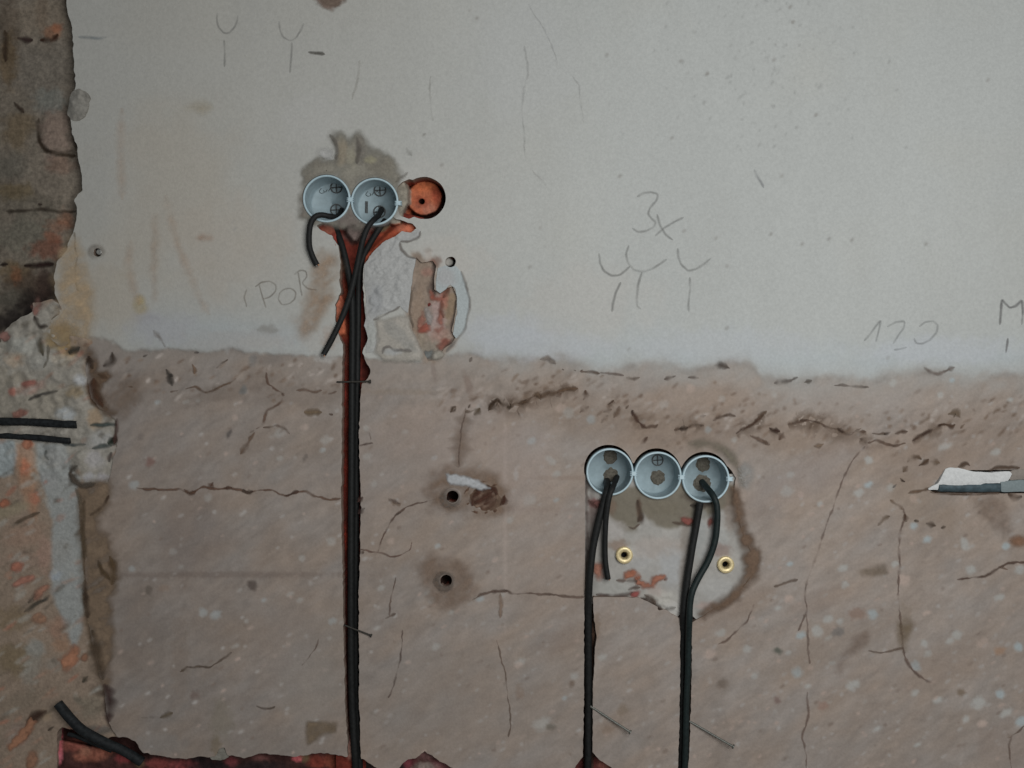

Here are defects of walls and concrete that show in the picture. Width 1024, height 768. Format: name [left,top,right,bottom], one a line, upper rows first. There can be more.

flaking render [409,258,457,361]
flaking render [0,0,140,768]
crack [142,483,363,514]
crack [361,500,424,698]
crack [477,590,583,618]
crack [871,500,944,680]
crack [957,561,1024,580]